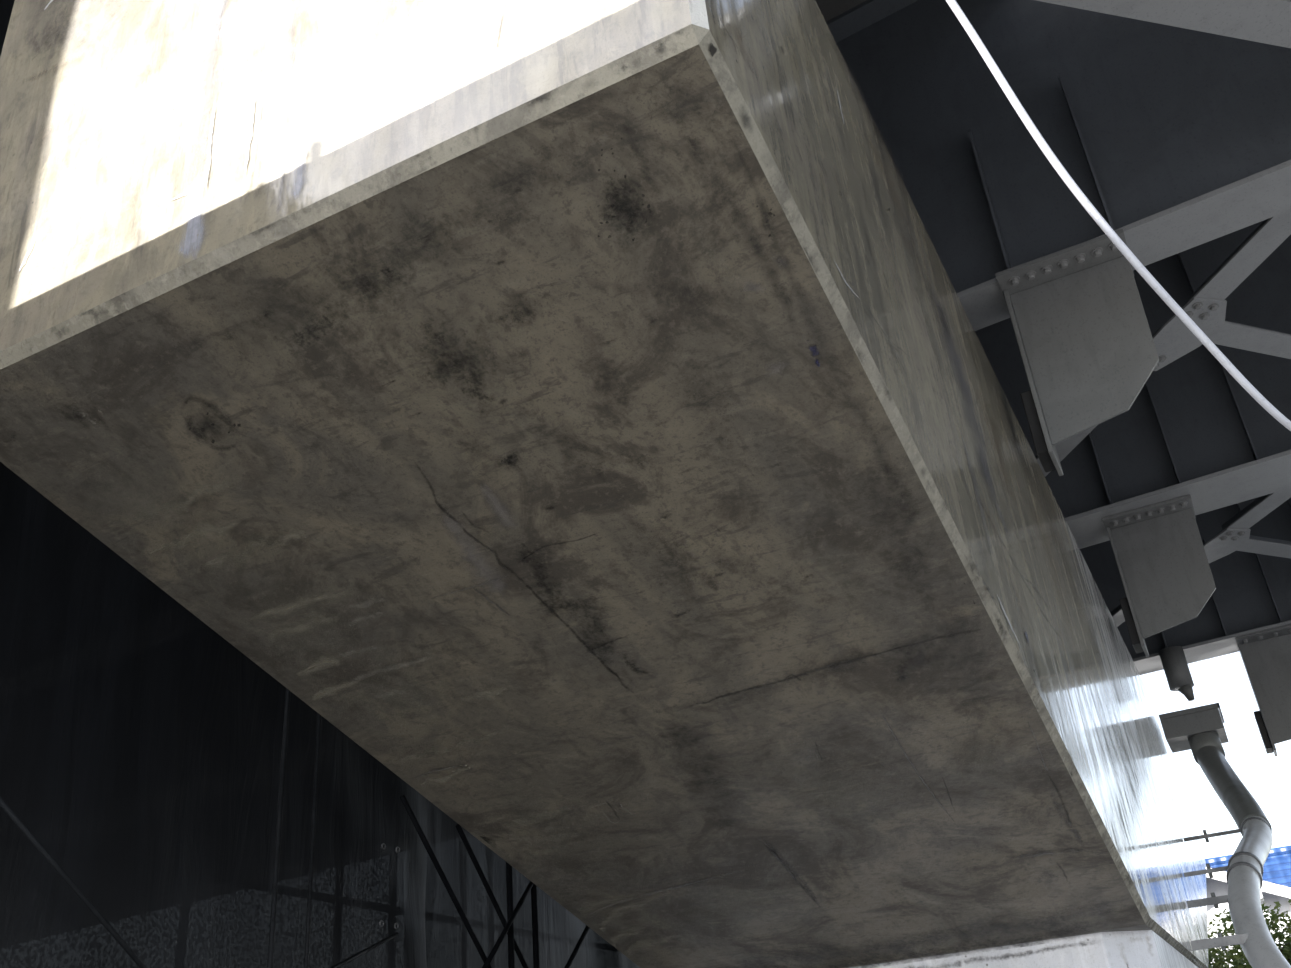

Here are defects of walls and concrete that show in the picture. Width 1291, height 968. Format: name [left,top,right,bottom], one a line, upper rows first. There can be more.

crack [419,468,645,677]